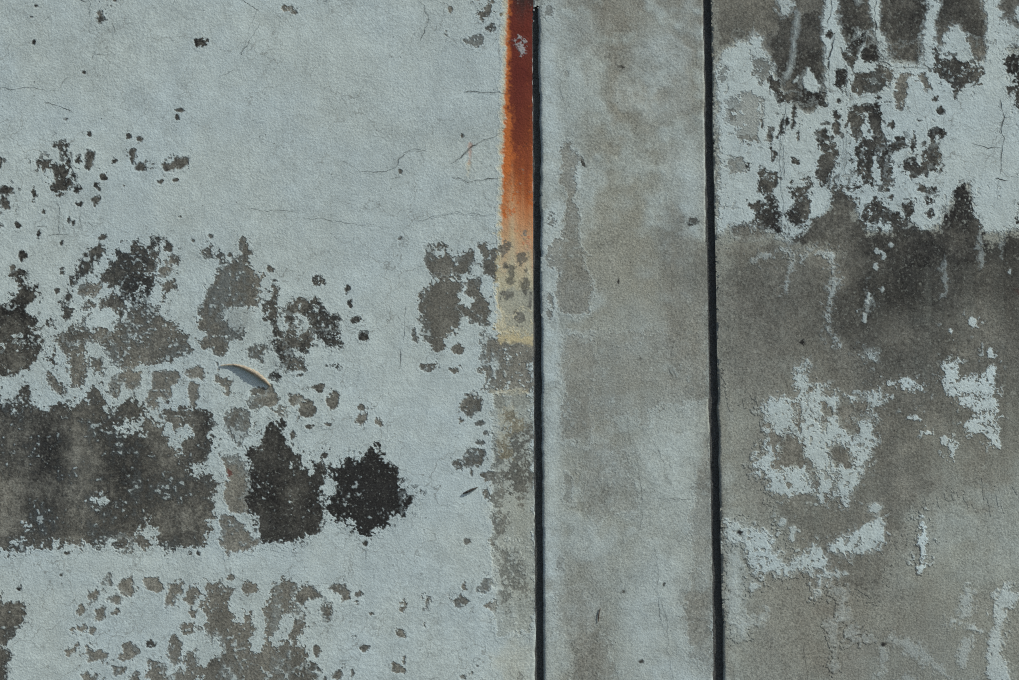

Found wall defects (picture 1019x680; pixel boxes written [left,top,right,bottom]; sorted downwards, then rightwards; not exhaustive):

peeling [189,34,215,52]
water stain [539,0,560,21]
peeling [171,104,187,123]
peeling [713,0,1019,237]
corrosion [491,0,540,349]
peeling [0,114,428,680]
peeling [407,236,534,502]
water stain [650,0,1019,680]
peeling [458,536,476,549]
peeling [389,571,495,680]
water stain [570,622,603,680]